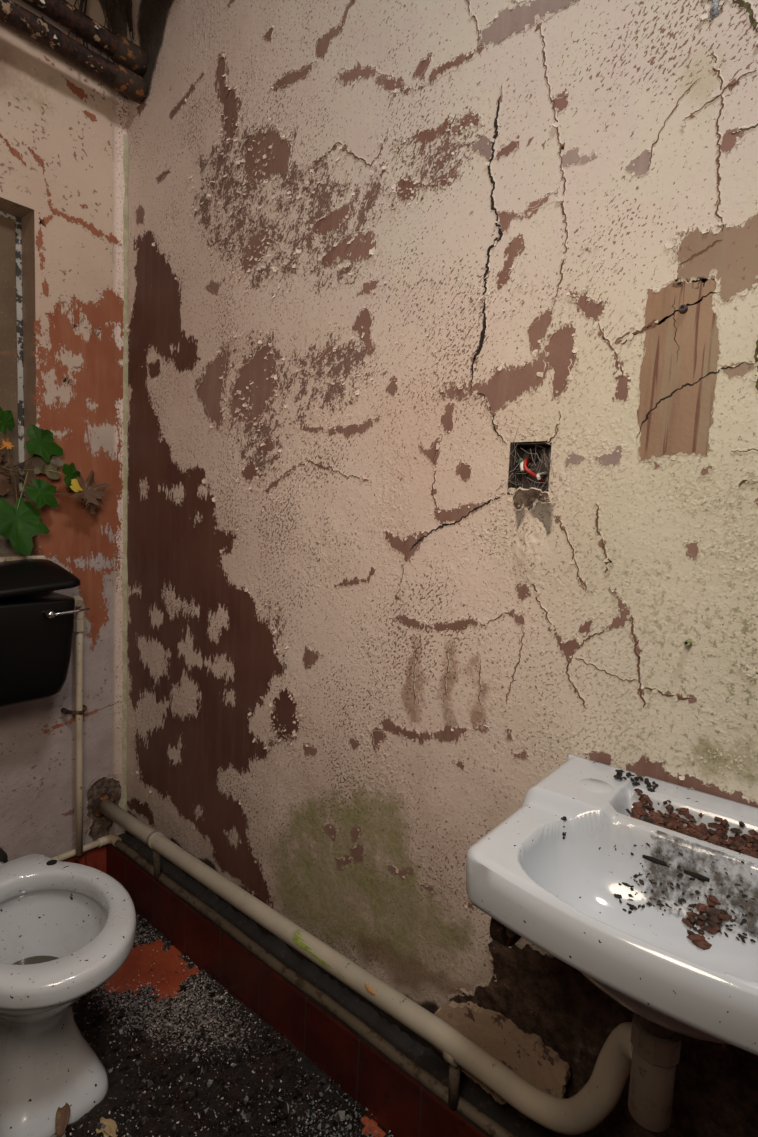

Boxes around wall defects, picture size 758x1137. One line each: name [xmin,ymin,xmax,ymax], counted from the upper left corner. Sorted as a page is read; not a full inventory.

crack [534,22,569,311]
peeling [625,148,654,177]
crack [648,0,758,265]
crack [468,84,509,446]
crack [592,291,718,377]
peeling [0,47,632,908]
crack [395,433,505,604]
peeling [683,492,758,587]
crack [478,580,697,710]
leakage [145,844,447,1063]
spalling [443,937,634,1099]
spalling [497,1034,758,1137]